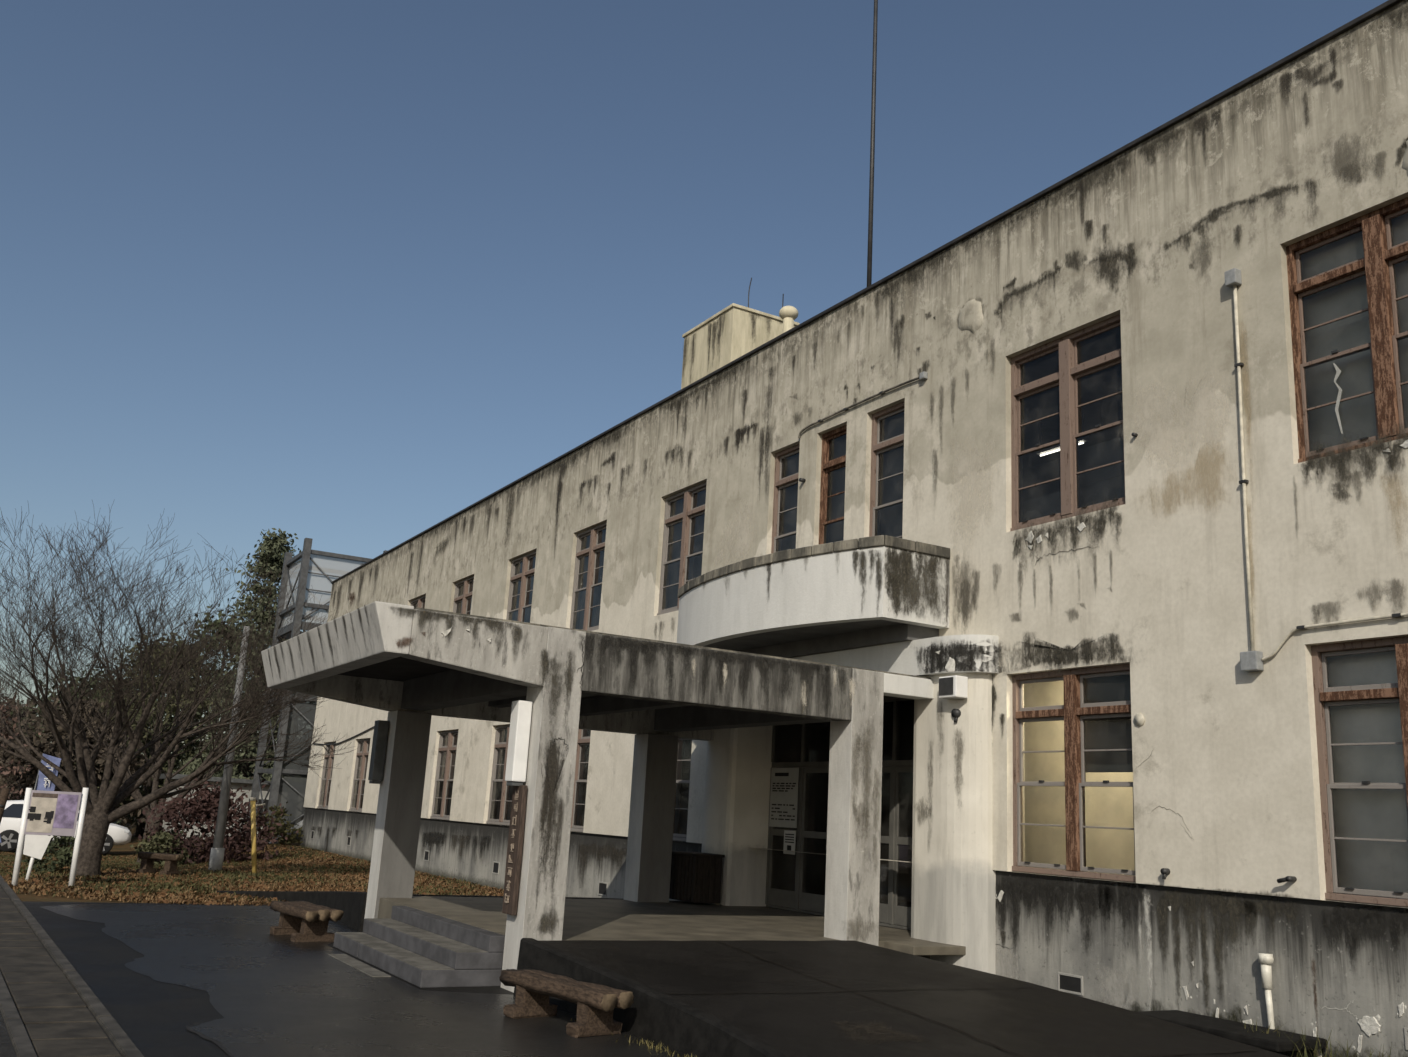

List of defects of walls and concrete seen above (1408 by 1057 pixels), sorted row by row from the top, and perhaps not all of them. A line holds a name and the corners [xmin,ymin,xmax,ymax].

leakage [1280,50,1343,124]
leakage [1335,141,1385,180]
leakage [1076,174,1098,235]
leakage [1294,427,1408,501]
leakage [852,549,979,619]
leakage [541,623,854,714]
leakage [917,613,1124,732]
leakage [422,832,491,859]
leakage [541,742,564,888]
leakage [539,913,558,932]
leakage [995,876,1297,1011]
peeling [1352,1002,1407,1053]